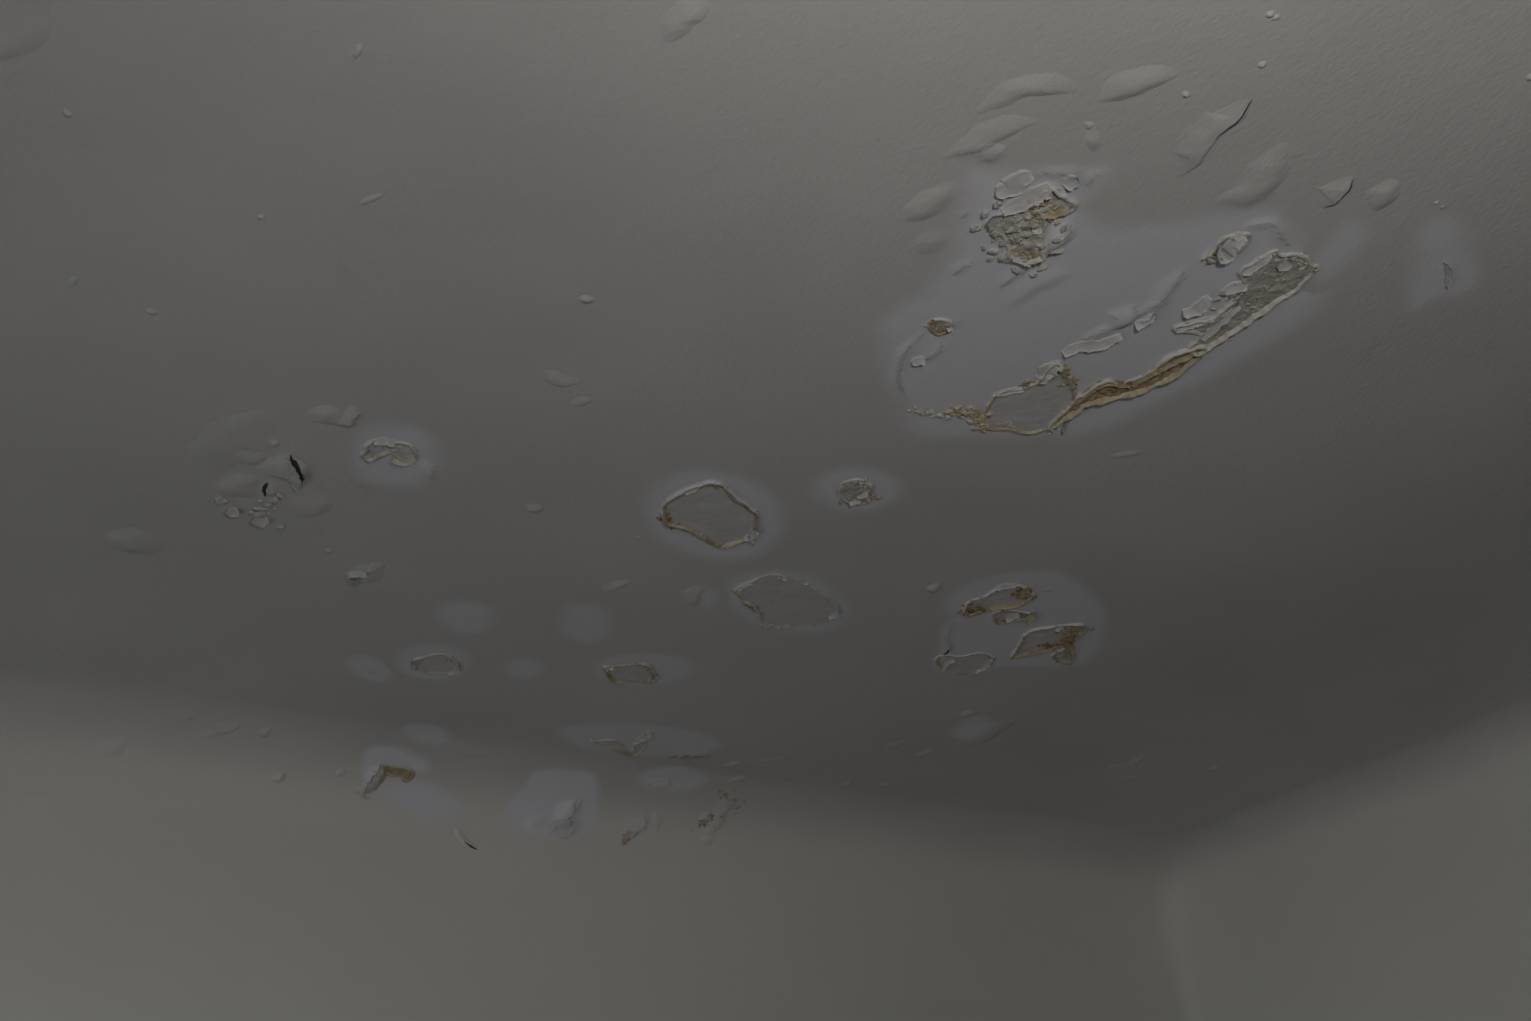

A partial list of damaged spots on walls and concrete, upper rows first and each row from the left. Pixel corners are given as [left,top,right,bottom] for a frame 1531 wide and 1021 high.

flaking render [953,170,1100,307]
peeling [894,220,1321,436]
peeling [360,437,436,479]
peeling [657,479,761,549]
peeling [836,477,882,506]
peeling [933,583,1095,675]
peeling [357,763,416,800]